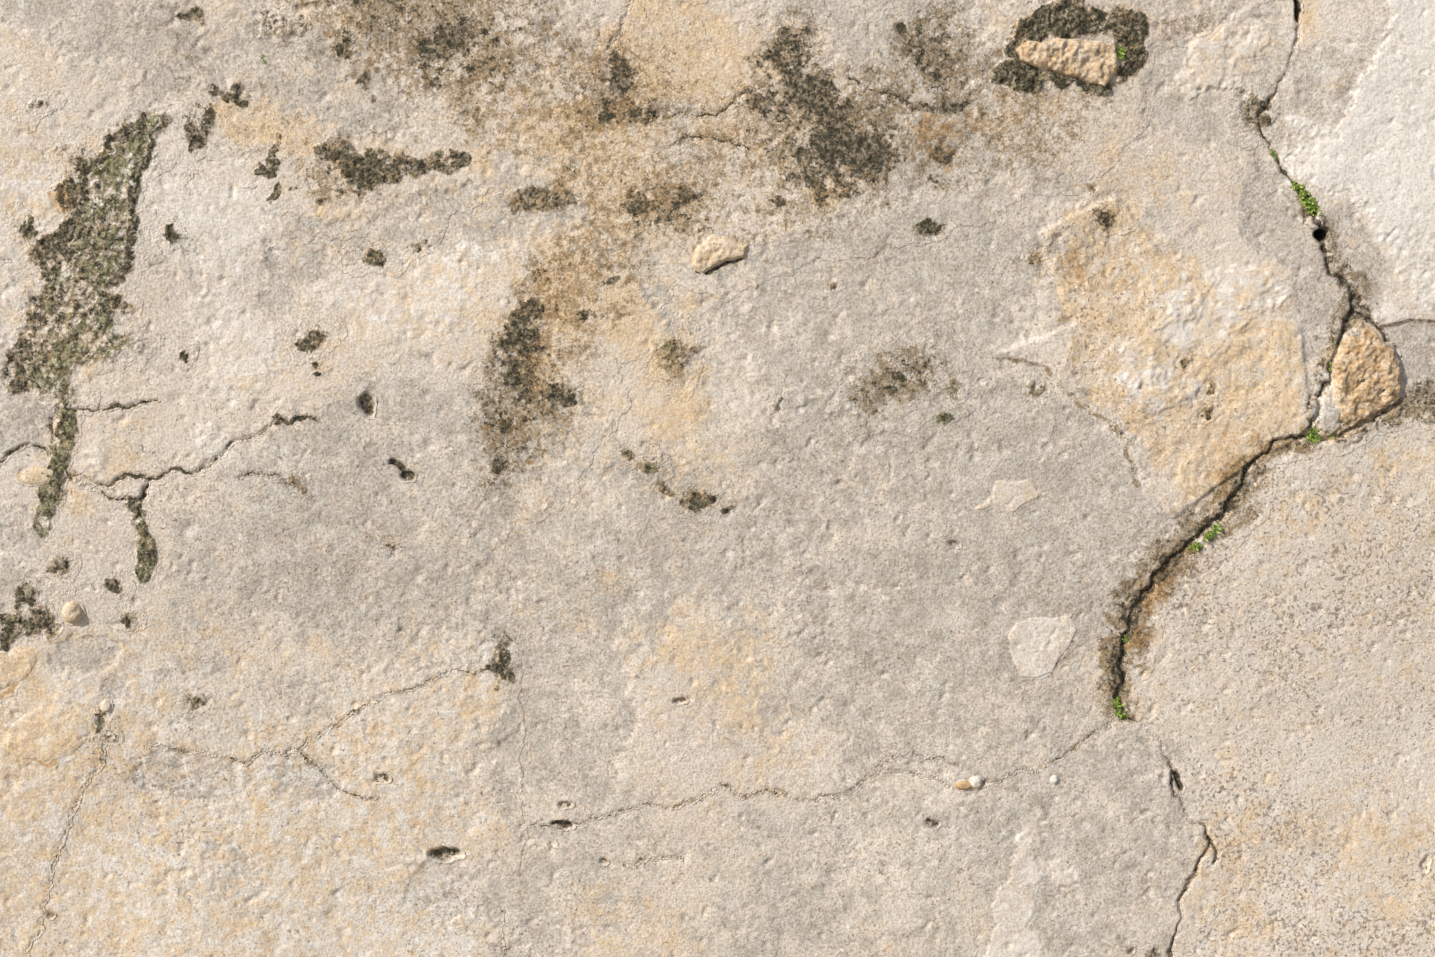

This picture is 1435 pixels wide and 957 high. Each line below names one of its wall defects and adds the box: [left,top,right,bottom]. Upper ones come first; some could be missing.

crack [0,399,320,509]
water stain [84,0,1154,875]
crack [516,0,1399,957]